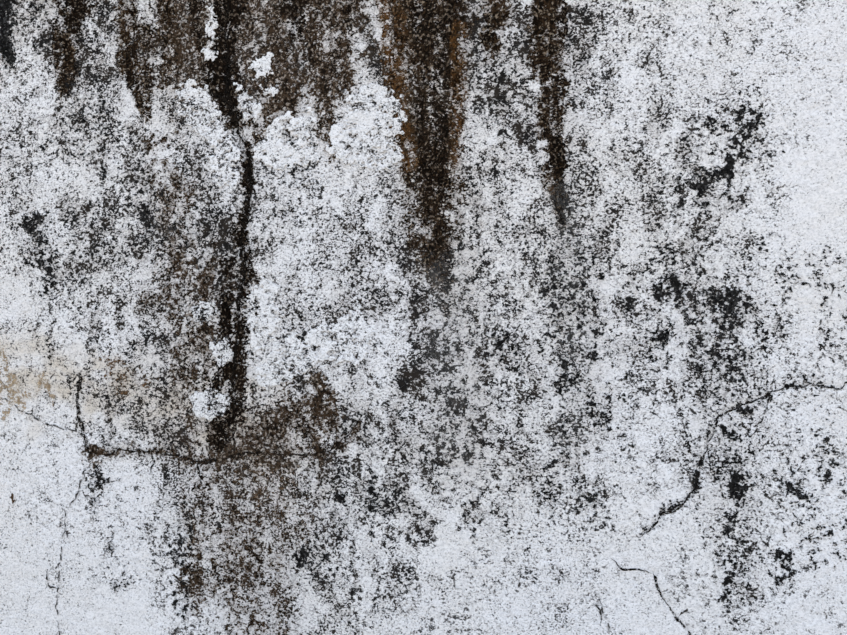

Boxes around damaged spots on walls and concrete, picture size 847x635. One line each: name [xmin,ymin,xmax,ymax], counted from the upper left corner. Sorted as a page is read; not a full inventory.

water stain [0,0,113,173]
water stain [661,70,784,210]
water stain [0,350,31,420]
water stain [10,200,67,303]
water stain [88,465,141,597]
crack [2,0,371,635]
water stain [111,0,644,635]
crack [612,559,691,635]
water stain [638,213,847,414]
crack [639,370,847,541]
water stain [696,391,847,631]